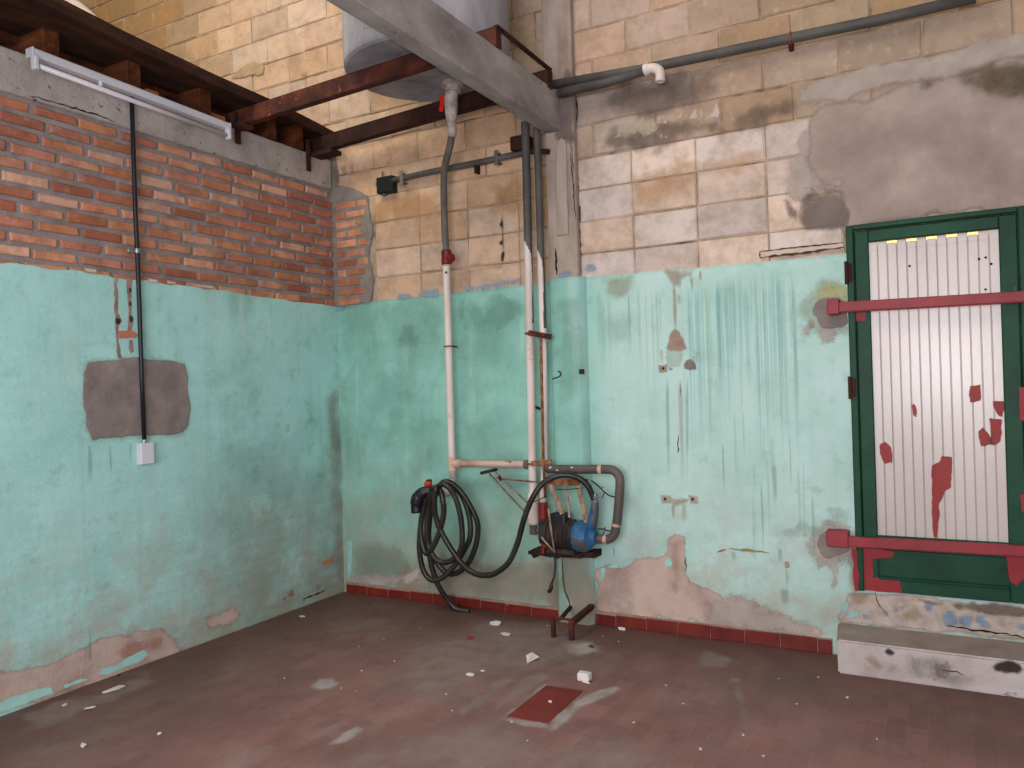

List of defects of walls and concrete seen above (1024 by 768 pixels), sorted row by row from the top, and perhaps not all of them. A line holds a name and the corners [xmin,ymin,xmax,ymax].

crack [32,96,121,122]
water stain [608,80,719,147]
flaking render [118,330,138,339]
flaking render [595,534,822,636]
peeling [838,593,1024,639]
flaking render [0,628,183,713]